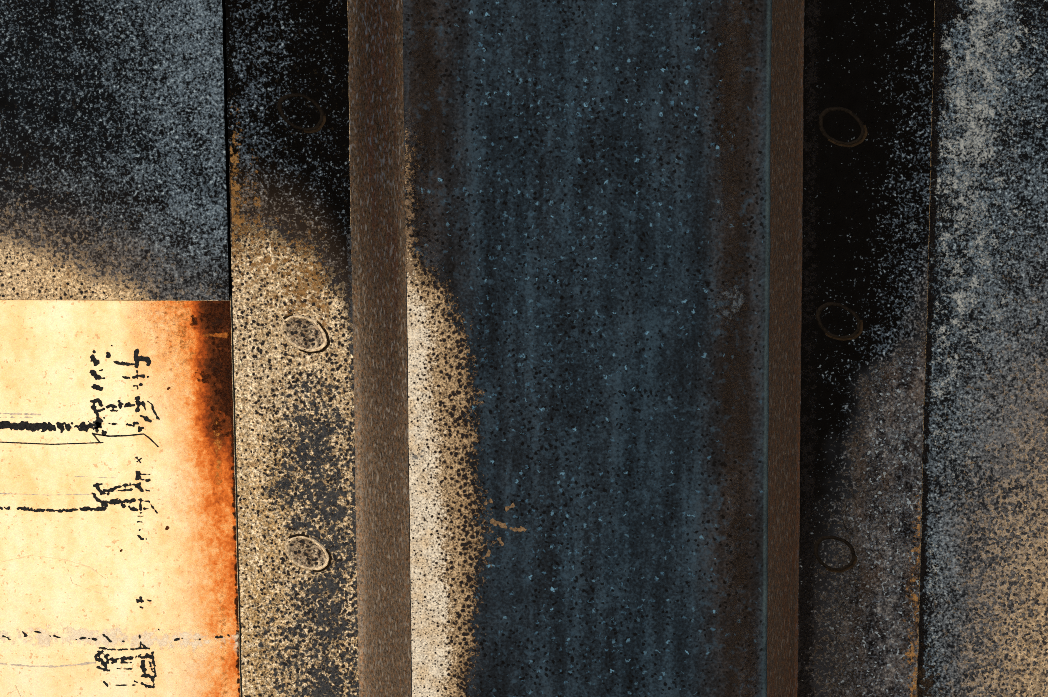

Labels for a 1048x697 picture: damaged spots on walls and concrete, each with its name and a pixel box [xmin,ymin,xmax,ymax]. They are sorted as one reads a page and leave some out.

rust [144,300,241,697]